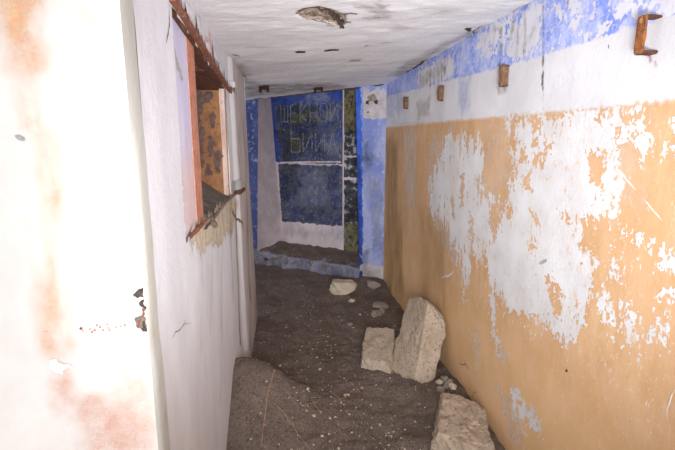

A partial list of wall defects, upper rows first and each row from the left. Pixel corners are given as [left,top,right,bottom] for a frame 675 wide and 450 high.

spalling [296,6,357,29]
peeling [413,0,675,88]
flaking render [189,179,244,253]
peeling [427,95,675,363]
flaking render [133,288,147,332]
peeling [507,387,545,442]